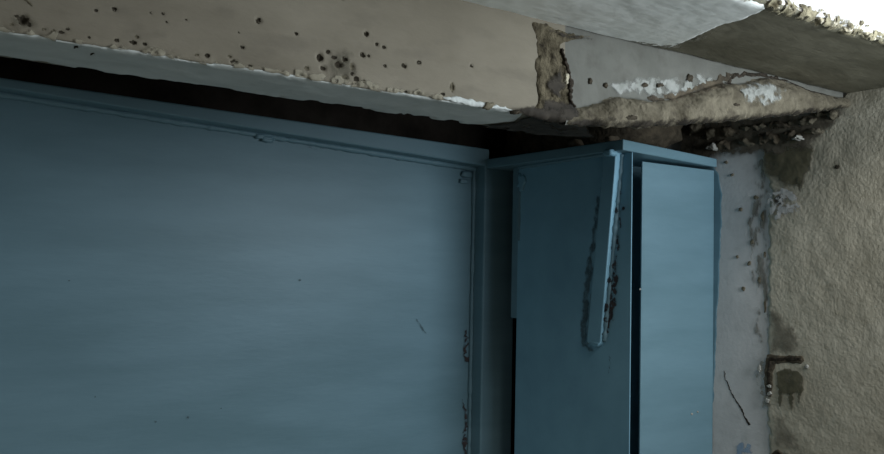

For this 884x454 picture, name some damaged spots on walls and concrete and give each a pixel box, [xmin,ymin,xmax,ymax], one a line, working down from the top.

spalling [767,0,884,44]
peeling [736,160,800,342]
crack [724,371,751,425]
leakage [777,369,804,410]